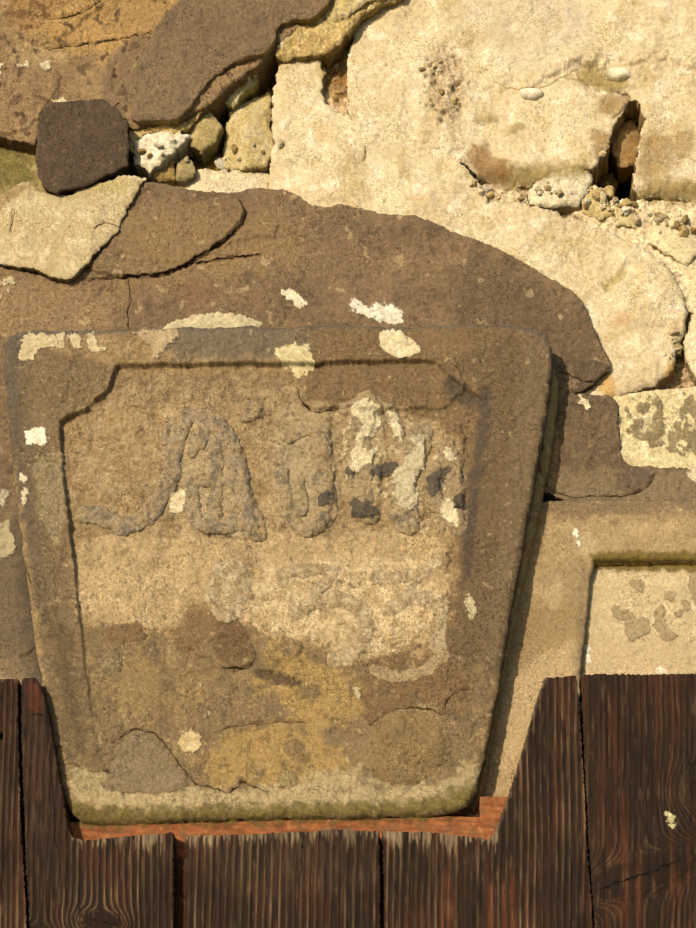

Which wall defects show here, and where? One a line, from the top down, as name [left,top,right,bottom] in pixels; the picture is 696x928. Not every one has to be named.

crack [91,200,259,330]
crack [215,721,309,733]
crack [113,728,269,793]